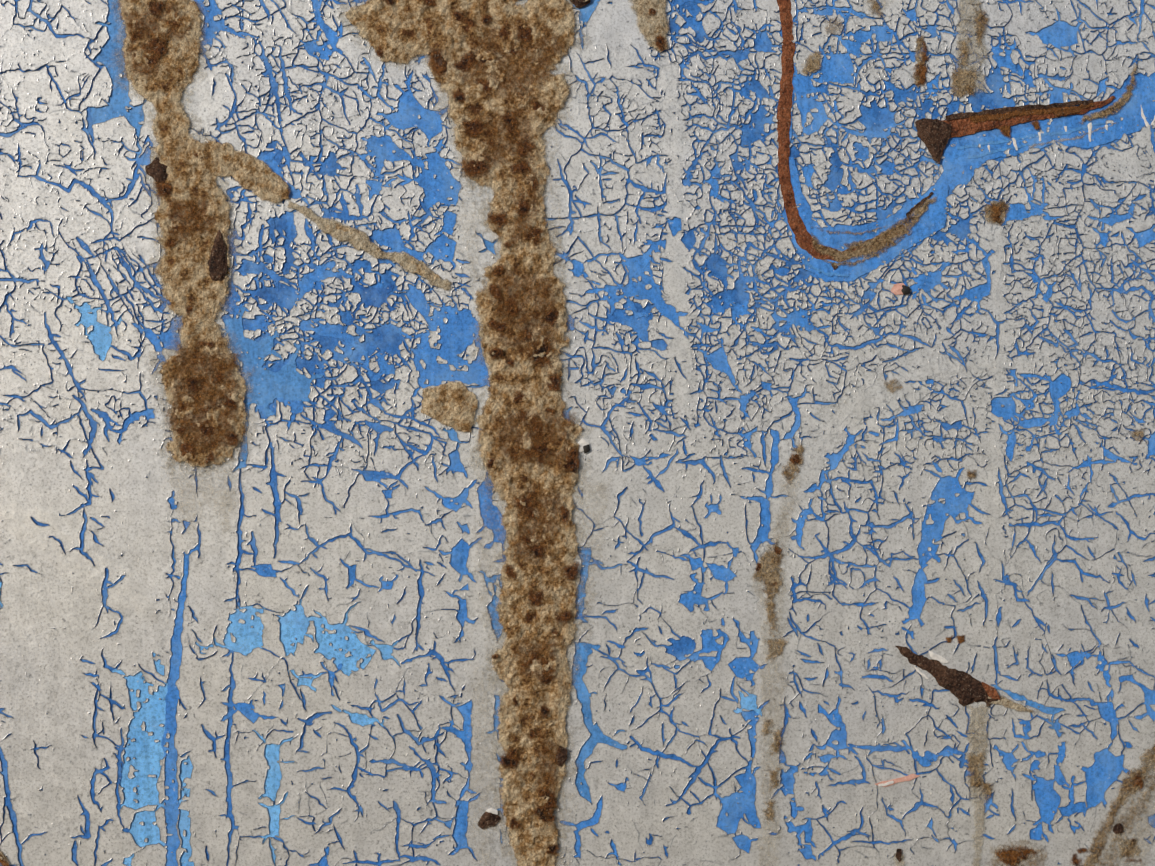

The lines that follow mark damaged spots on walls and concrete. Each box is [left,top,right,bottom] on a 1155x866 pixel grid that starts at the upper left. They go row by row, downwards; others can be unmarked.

crack [0,91,151,866]
peeling [111,491,265,866]
rust [118,0,451,467]
crack [225,394,476,866]
rust [345,0,591,866]
rust [631,0,669,53]
crack [566,330,768,806]
peeling [553,210,924,860]
crack [787,453,1016,859]
spalling [793,0,1155,190]
peeling [896,460,1155,842]
rust [1071,745,1155,866]